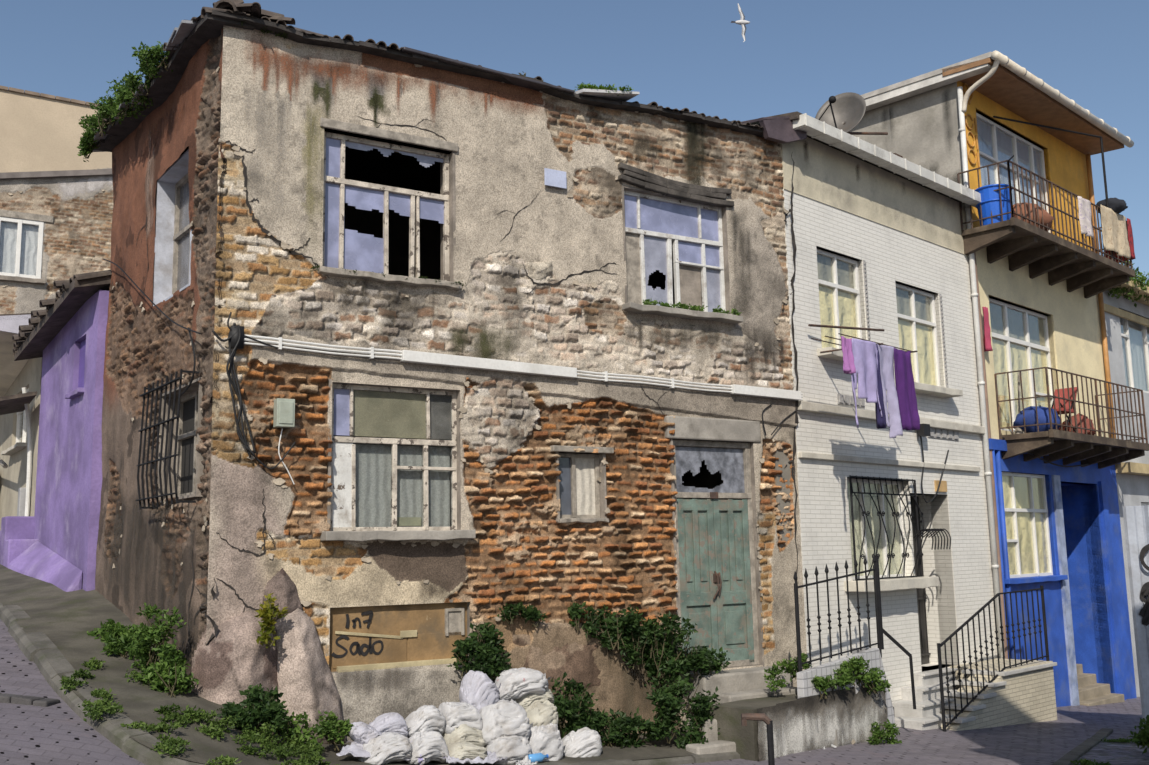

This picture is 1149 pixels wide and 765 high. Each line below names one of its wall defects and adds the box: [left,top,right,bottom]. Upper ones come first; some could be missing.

rust [253,41,446,113]
leakage [368,90,384,125]
crack [218,140,329,278]
crack [498,193,539,243]
crack [521,262,619,294]
spalling [0,29,795,665]
crack [219,489,275,556]
crack [188,550,260,655]